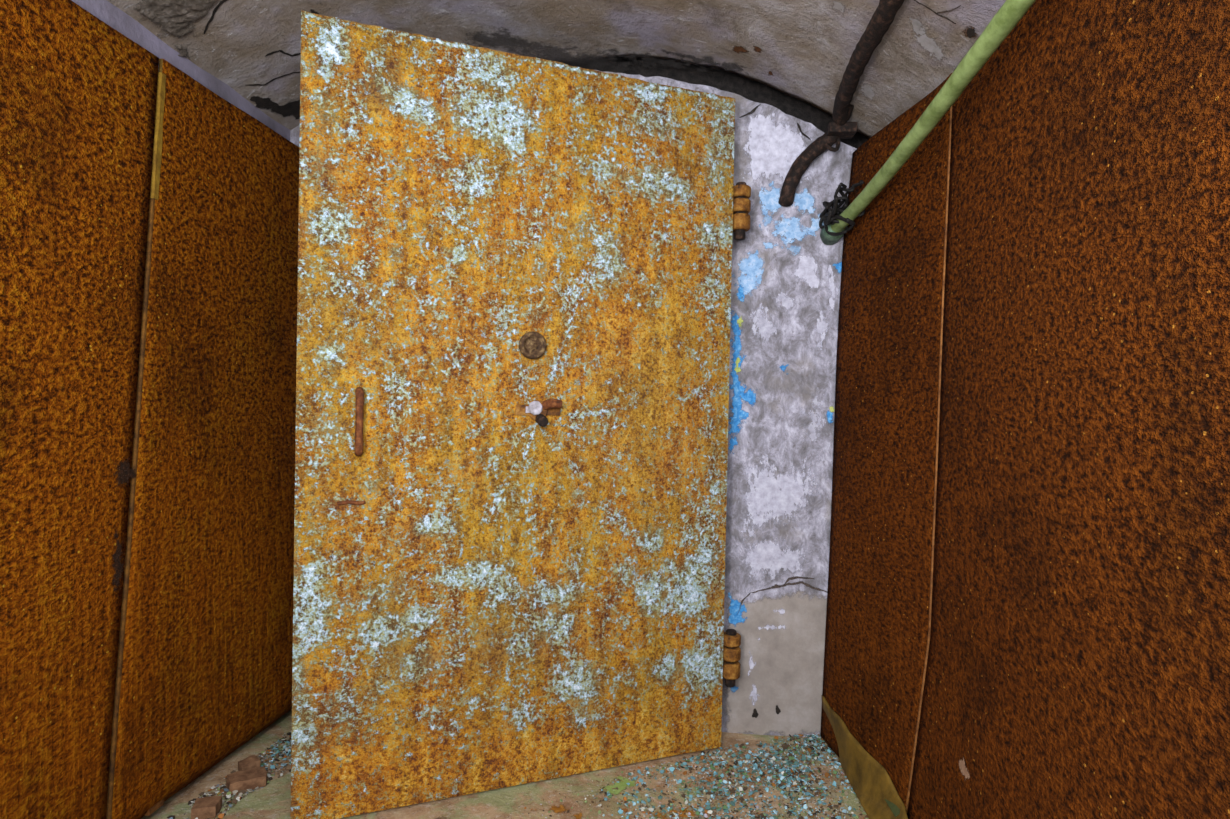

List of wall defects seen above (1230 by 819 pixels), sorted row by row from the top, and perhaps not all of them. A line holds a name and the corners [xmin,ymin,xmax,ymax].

crack [204,0,227,34]
crack [250,50,301,119]
peeling [728,113,842,454]
peeling [739,449,817,582]
rust [549,805,582,819]
rust [651,806,695,819]